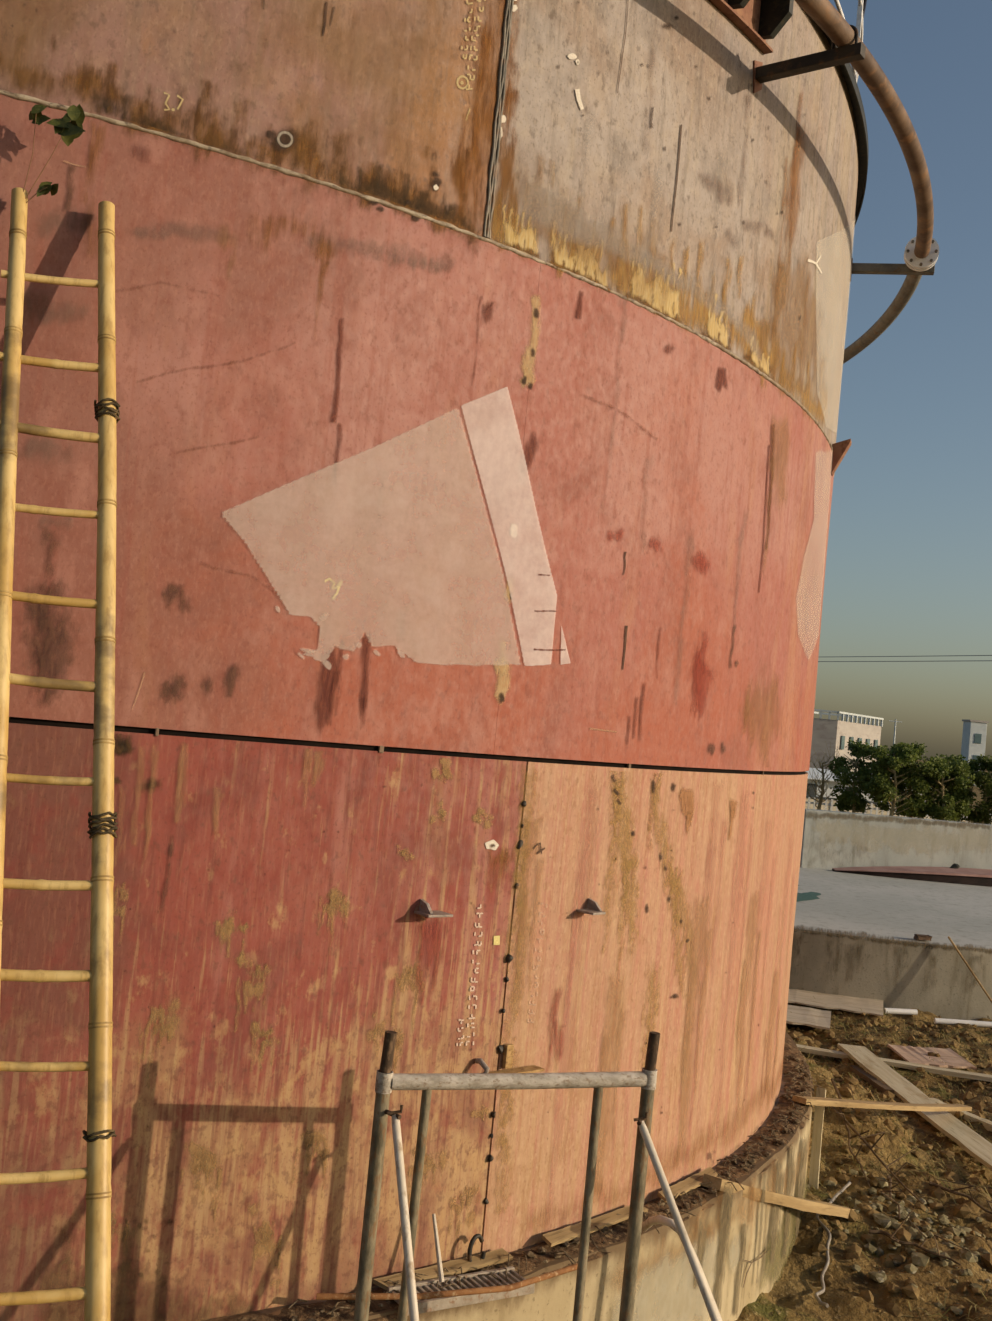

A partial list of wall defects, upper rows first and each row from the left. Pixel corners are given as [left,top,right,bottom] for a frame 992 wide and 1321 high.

corrosion [0,29,512,242]
corrosion [492,150,827,425]
leakage [28,585,72,701]
peeling [561,638,569,664]